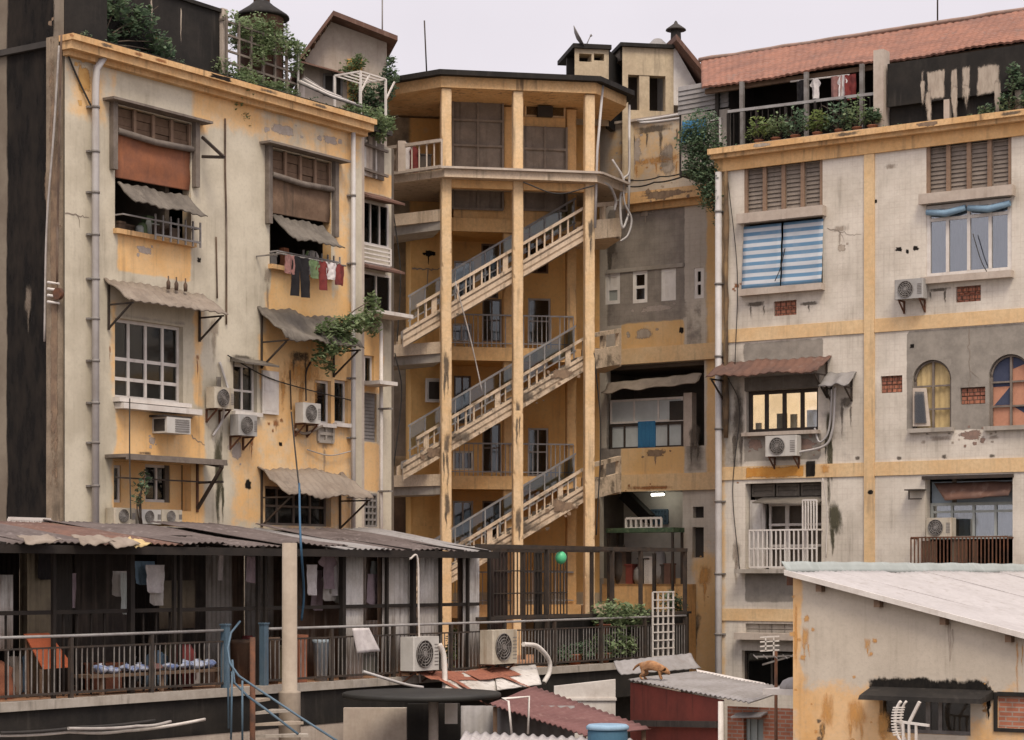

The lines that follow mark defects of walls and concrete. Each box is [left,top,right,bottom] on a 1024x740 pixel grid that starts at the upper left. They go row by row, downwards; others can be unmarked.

peeling [920,65,1001,121]
damp [634,125,678,146]
damp [806,398,852,477]
damp [215,433,224,520]
damp [828,477,842,554]
damp [790,613,814,660]
damp [811,698,831,740]
damp [849,703,889,740]